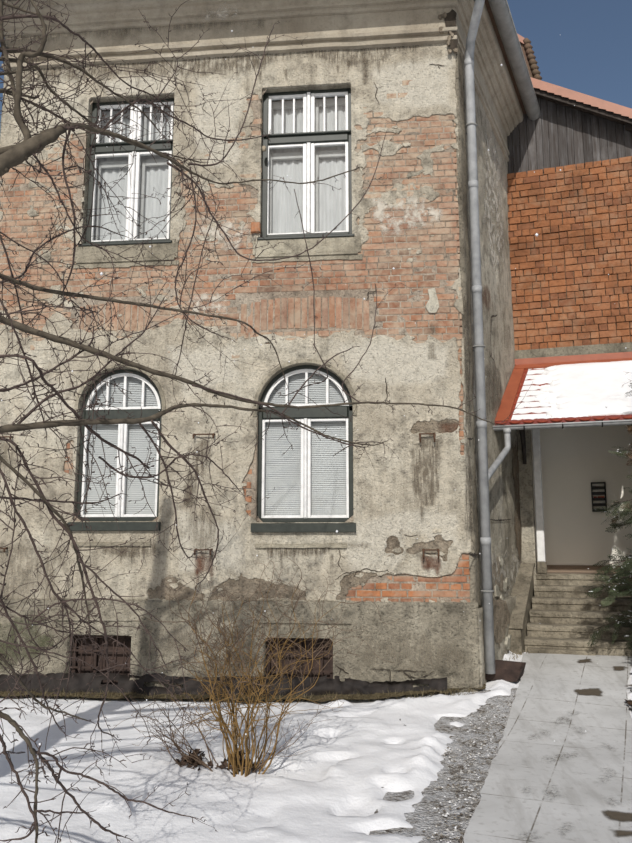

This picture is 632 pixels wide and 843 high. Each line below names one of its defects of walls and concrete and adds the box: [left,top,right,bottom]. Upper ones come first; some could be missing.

damp [28,54,284,85]
damp [303,45,414,81]
spalling [228,94,262,148]
spalling [0,107,468,467]
damp [412,438,439,516]
flaking render [383,529,453,561]
flaking render [146,574,306,601]
spalling [336,553,470,603]